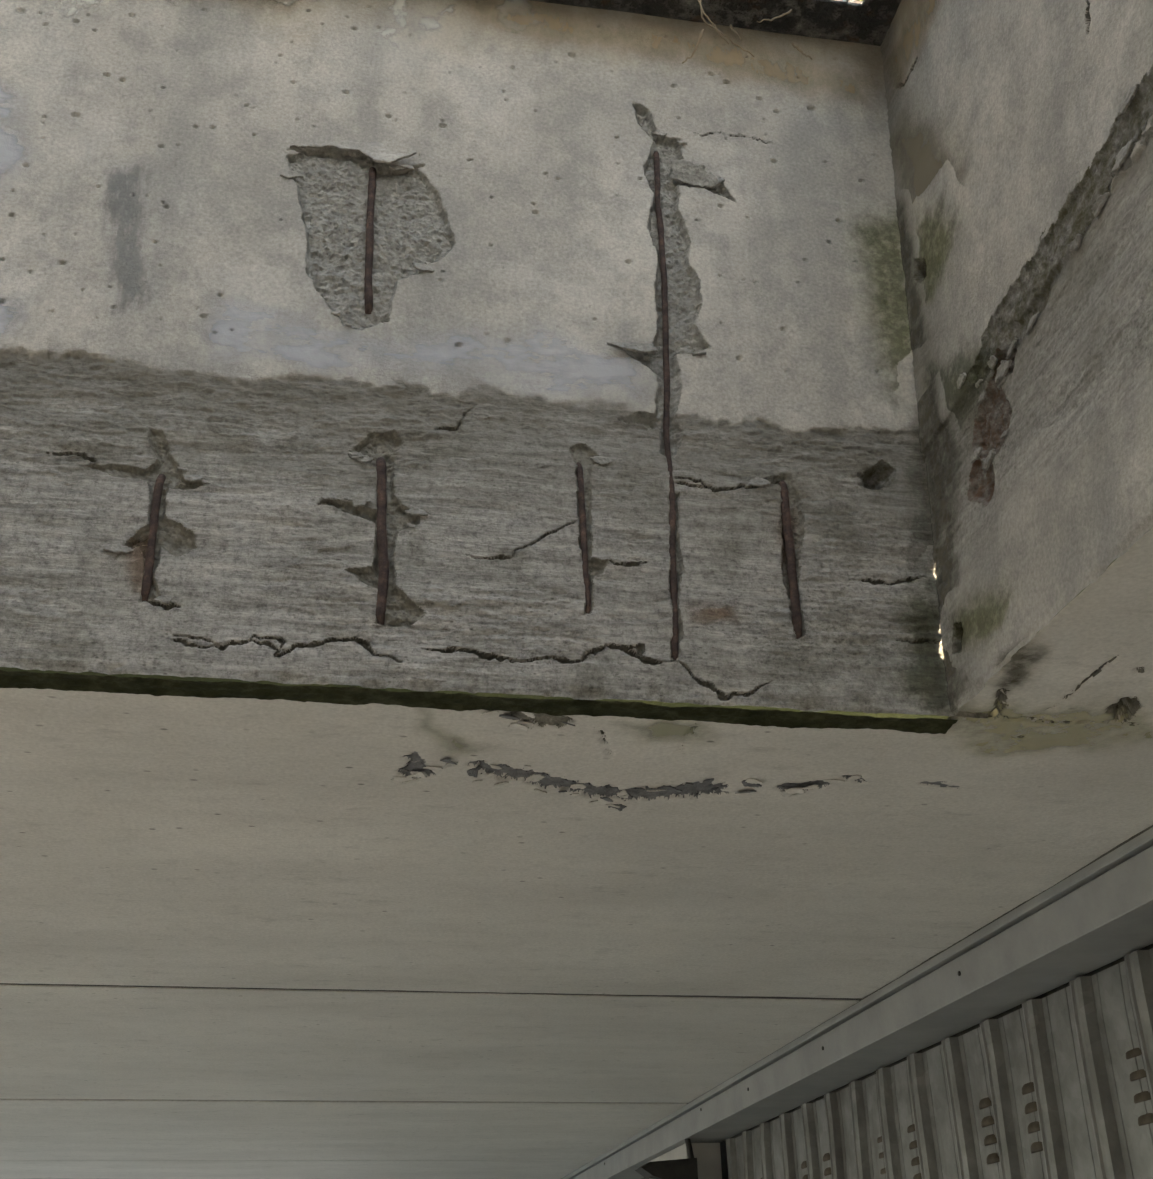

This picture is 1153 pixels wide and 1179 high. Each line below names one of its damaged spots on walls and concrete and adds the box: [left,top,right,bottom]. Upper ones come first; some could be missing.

spalling [280,140,455,330]
spalling [957,64,1153,506]
spalling [603,101,737,663]
spalling [77,429,210,605]
crack [148,601,394,660]
spalling [314,429,428,627]
spalling [569,443,612,615]
crack [427,643,767,701]
spalling [748,473,806,640]
corrosion [780,515,795,563]
hole [857,459,896,491]
peeling [391,751,763,811]